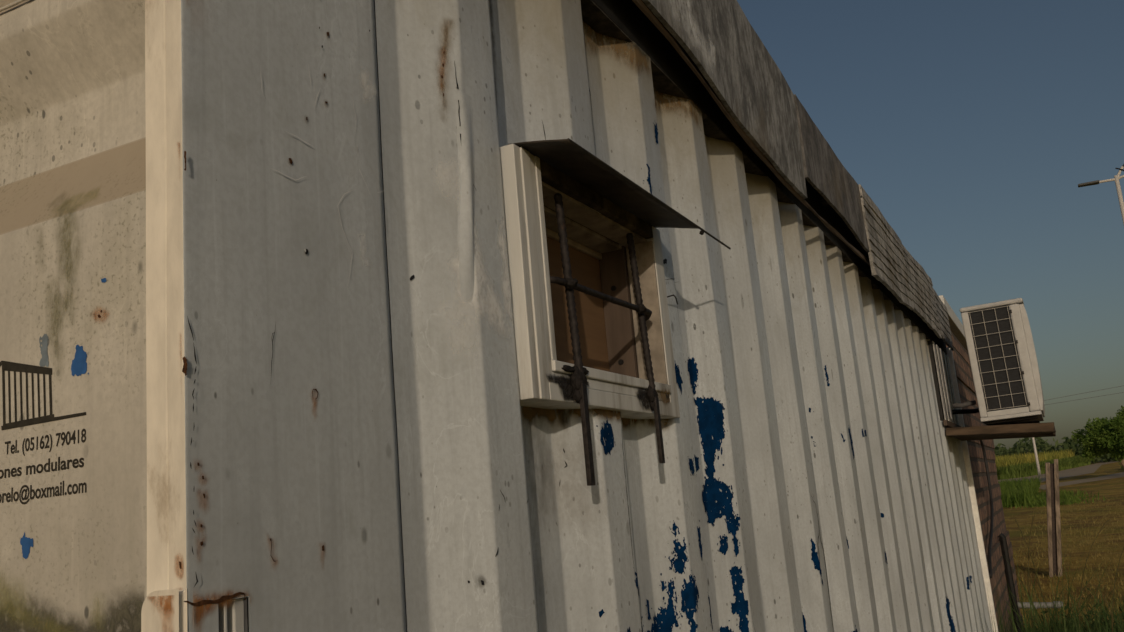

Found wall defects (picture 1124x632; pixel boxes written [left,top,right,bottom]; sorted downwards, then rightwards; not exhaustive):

corrosion [440,26,448,96]
peeling [71,345,89,376]
peeling [596,420,616,456]
peeling [627,357,749,632]
peeling [20,532,33,559]
peeling [810,538,823,584]
corrosion [152,592,246,625]
peeling [945,598,956,632]